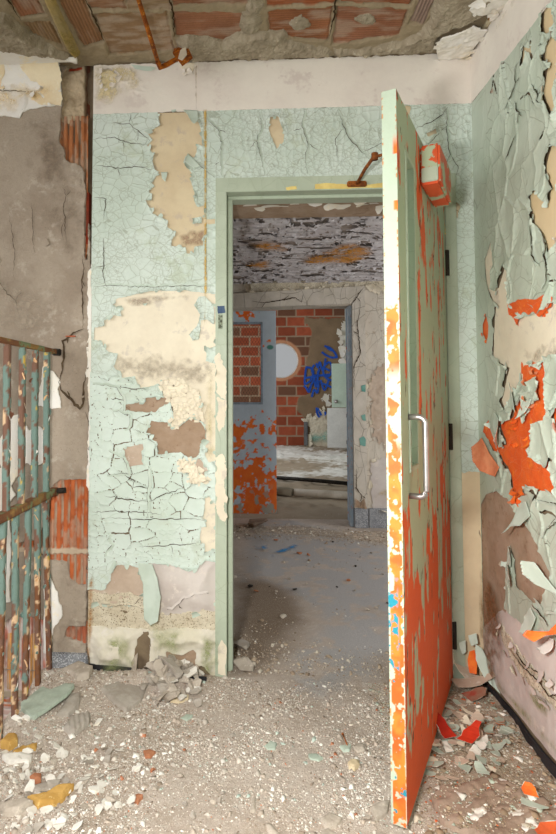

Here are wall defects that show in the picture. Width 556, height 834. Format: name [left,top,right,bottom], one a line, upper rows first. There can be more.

peeling [468,0,502,17]
peeling [541,0,556,113]
crack [96,118,150,145]
crack [196,112,226,177]
peeling [531,145,556,253]
flaking render [0,61,228,669]
peeling [359,362,386,447]
peeling [368,457,387,512]
peeling [218,640,227,676]
peeling [521,781,556,809]